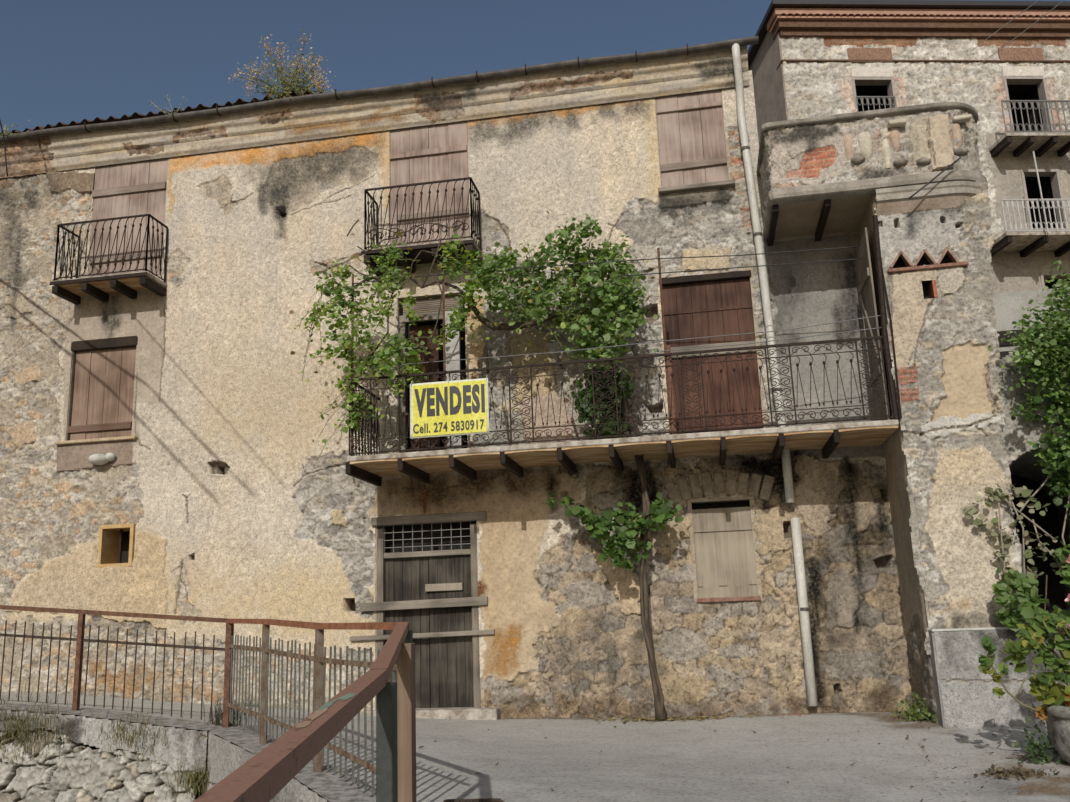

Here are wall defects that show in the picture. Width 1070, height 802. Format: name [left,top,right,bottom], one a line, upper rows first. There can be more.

leakage [259,149,355,236]
crack [290,175,374,215]
flaking render [786,144,837,179]
spalling [470,126,790,448]
peeling [891,266,965,403]
flaking render [0,124,379,710]
peeling [921,411,1002,439]
flaking render [480,449,938,724]
leakage [806,544,846,713]
leakage [846,461,862,589]
leakage [877,487,887,532]